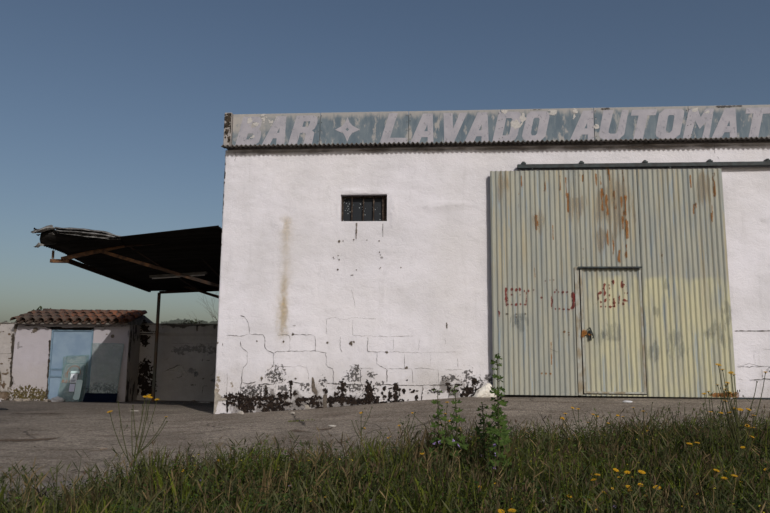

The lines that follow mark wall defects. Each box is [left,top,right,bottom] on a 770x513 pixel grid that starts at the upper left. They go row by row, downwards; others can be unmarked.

rust [595,169,629,262]
spalling [0,321,18,399]
crack [214,290,461,402]
leakage [188,364,493,414]